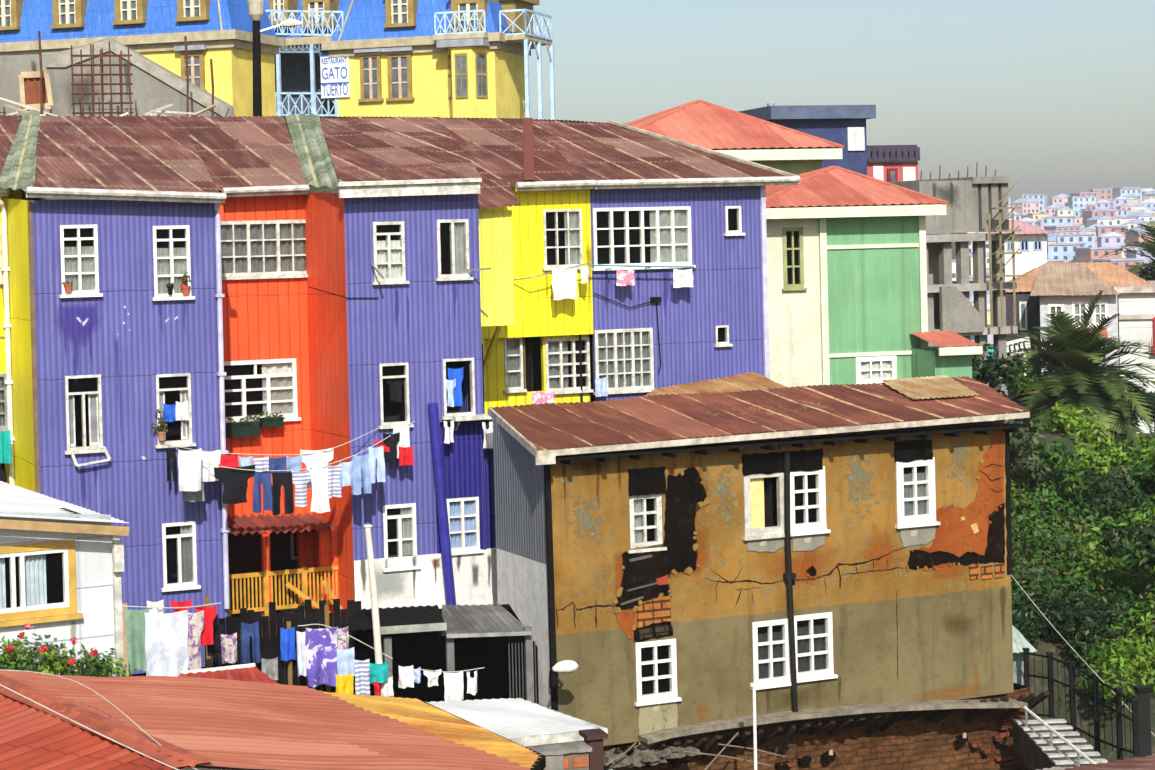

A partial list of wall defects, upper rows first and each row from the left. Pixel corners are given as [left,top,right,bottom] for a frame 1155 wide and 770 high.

peeling [561,479,612,556]
flaking render [613,456,741,642]
crack [705,548,906,677]
flaking render [906,420,1005,579]